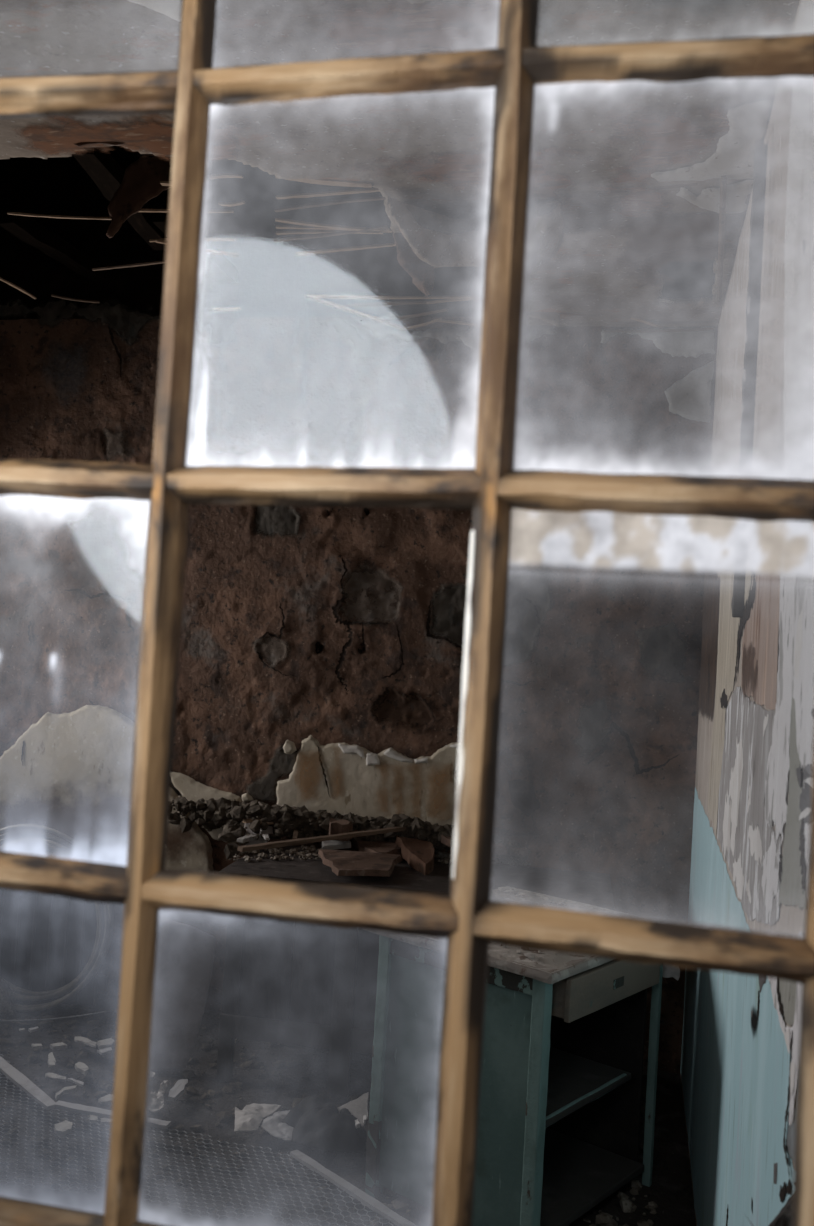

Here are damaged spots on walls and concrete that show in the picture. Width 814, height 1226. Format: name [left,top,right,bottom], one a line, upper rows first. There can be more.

peeling [128,0,182,22]
peeling [795,0,814,29]
flaking render [651,99,773,182]
peeling [783,91,814,420]
flaking render [333,312,482,363]
flaking render [522,325,557,342]
spalling [253,634,290,666]
spalling [426,583,468,655]
spalling [504,568,553,666]
peeling [698,571,814,937]
peeling [758,976,802,1126]
spalling [774,1163,791,1202]